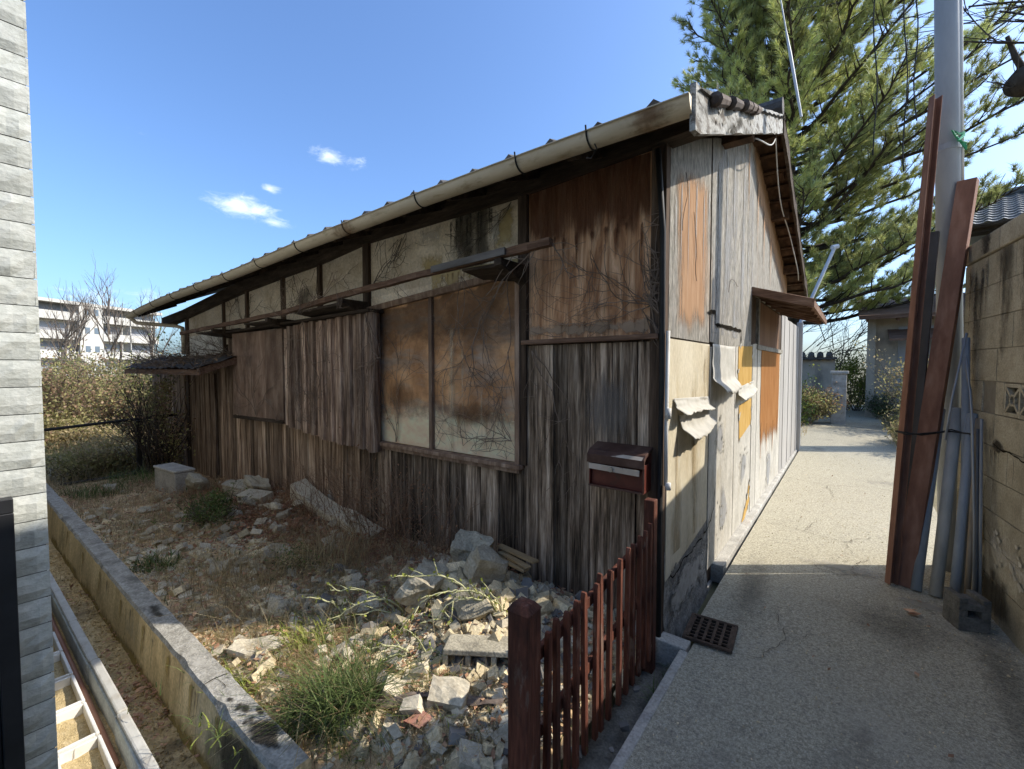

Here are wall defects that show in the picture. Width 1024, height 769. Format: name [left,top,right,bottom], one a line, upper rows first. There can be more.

damp [450,208,492,268]
damp [969,234,1024,337]
crack [994,444,1024,482]
spalling [669,490,728,626]